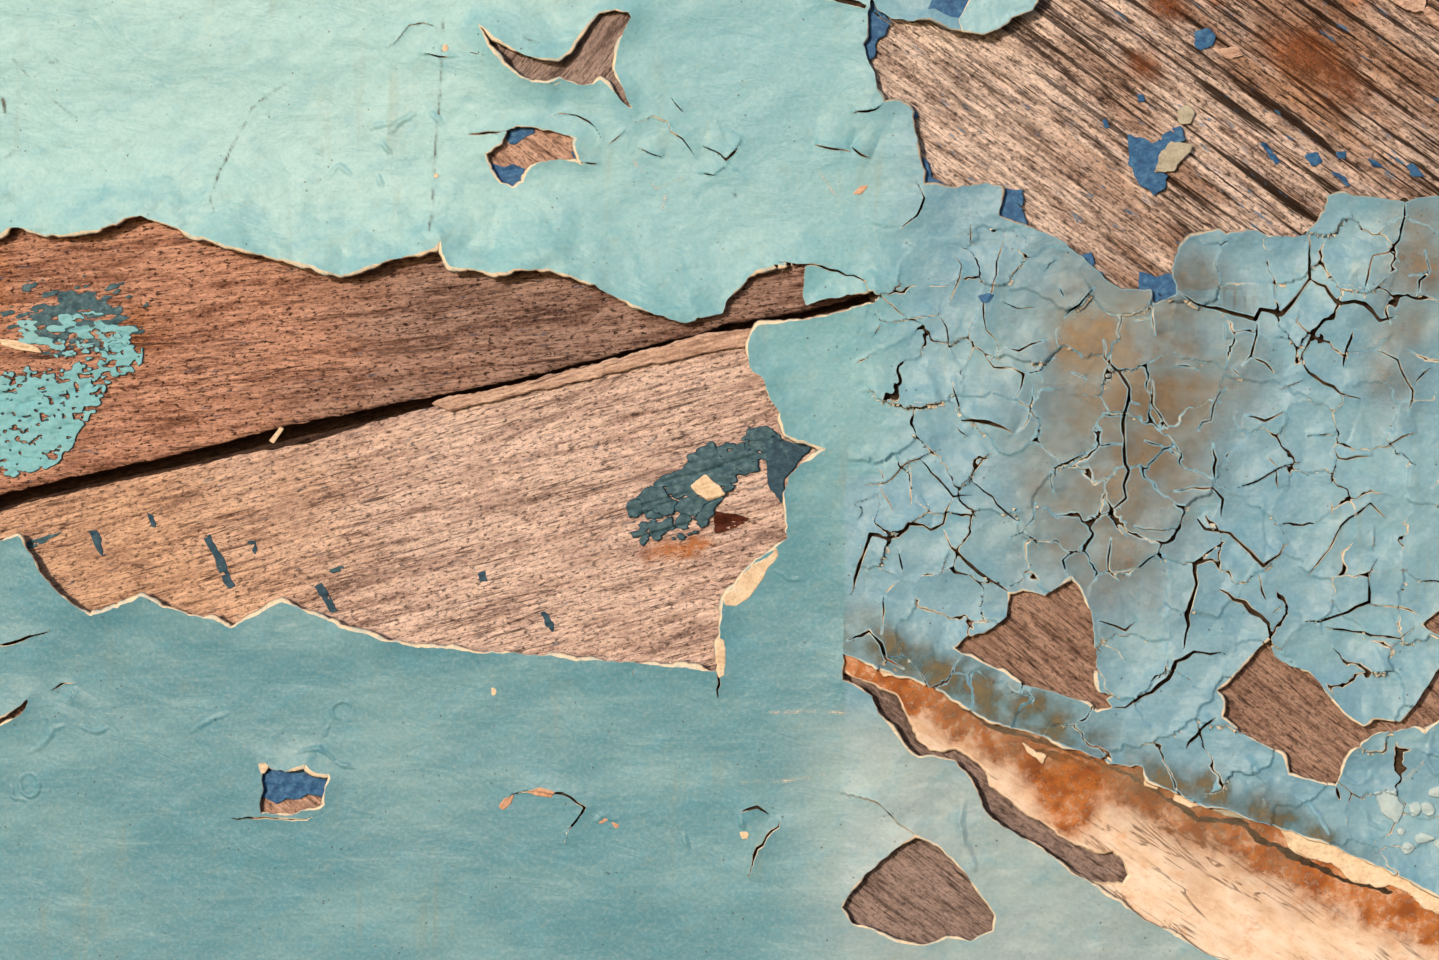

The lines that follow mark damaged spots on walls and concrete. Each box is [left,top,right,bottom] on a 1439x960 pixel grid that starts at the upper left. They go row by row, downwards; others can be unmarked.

peeling [478,9,632,109]
crack [550,98,739,176]
peeling [833,0,1439,304]
crack [0,341,674,511]
peeling [0,215,876,678]
crack [714,197,1439,894]
crack [0,630,49,646]
peeling [953,564,1124,718]
peeling [1217,624,1439,792]
crack [511,789,586,843]
peeling [841,654,1439,960]
corrosion [844,654,1439,946]